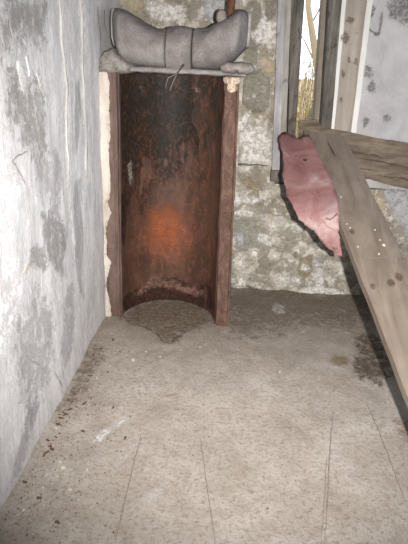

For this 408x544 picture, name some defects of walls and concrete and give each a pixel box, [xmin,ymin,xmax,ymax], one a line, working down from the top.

leakage [353,333,394,386]
crack [115,435,141,543]
crack [200,438,215,538]
crack [321,412,334,544]
crack [366,402,408,507]